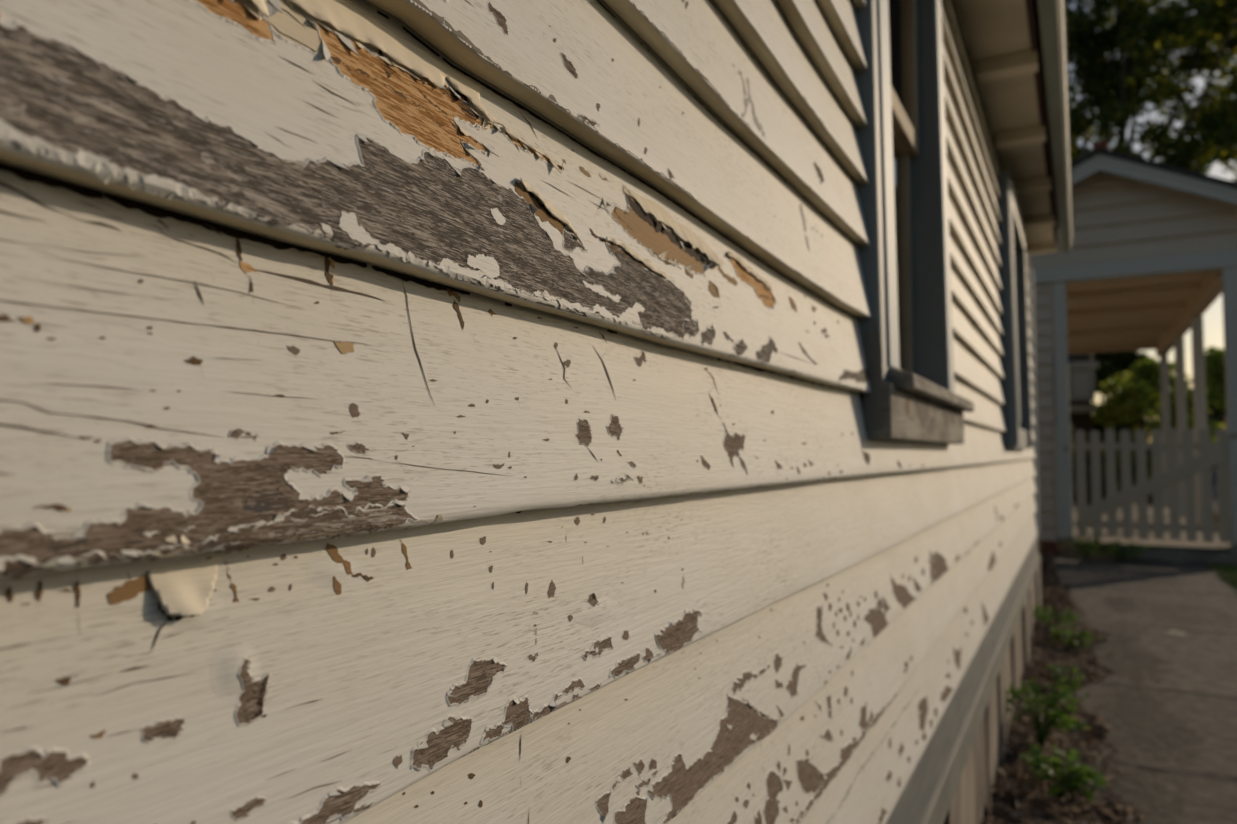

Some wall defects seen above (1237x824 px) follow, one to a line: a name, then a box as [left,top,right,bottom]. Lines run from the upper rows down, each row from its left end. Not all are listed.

peeling [0,0,778,364]
crack [0,181,435,405]
crack [453,300,474,338]
crack [0,383,221,443]
peeling [0,427,420,617]
peeling [589,460,643,485]
peeling [0,745,90,799]
peeling [234,656,270,727]
peeling [393,608,704,773]
peeling [595,652,806,824]
peeling [815,540,979,674]
peeling [888,600,989,764]